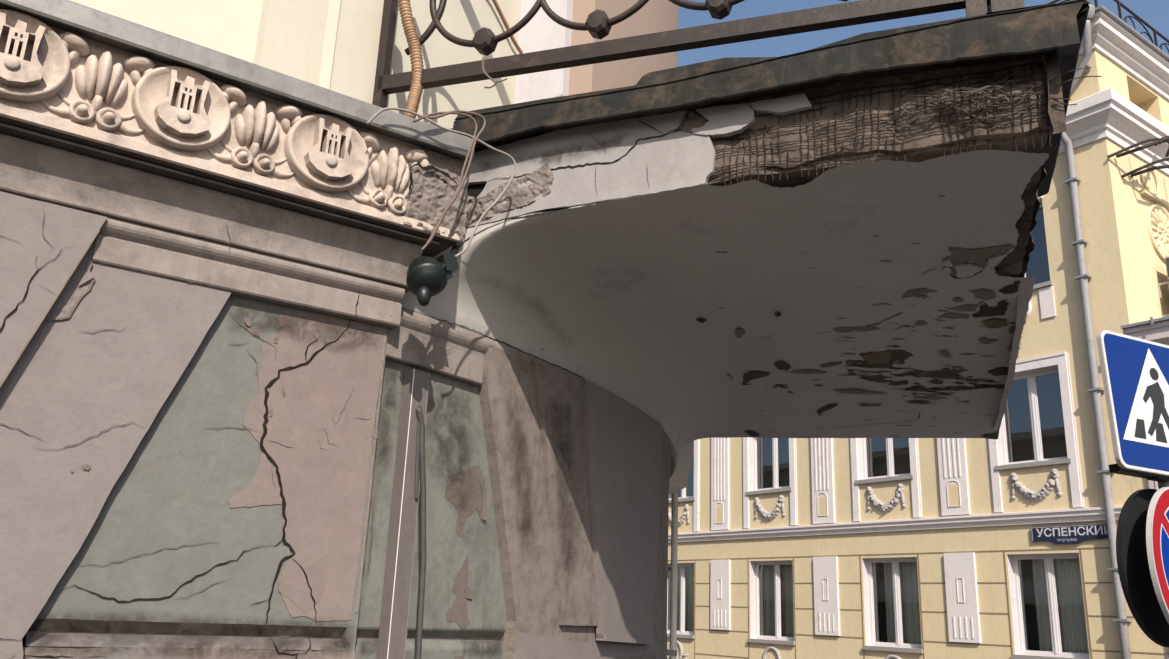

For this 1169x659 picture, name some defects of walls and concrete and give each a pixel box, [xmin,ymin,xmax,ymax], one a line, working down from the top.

crack [409,163,457,193]
flaking render [402,145,554,240]
crack [489,112,686,196]
peeling [680,54,1067,345]
crack [0,209,74,332]
peeling [847,370,1004,389]
crack [0,422,146,450]
crack [60,296,384,659]
peeling [445,465,487,537]
peeling [446,555,474,629]
crack [0,638,101,659]
peeling [25,646,325,659]